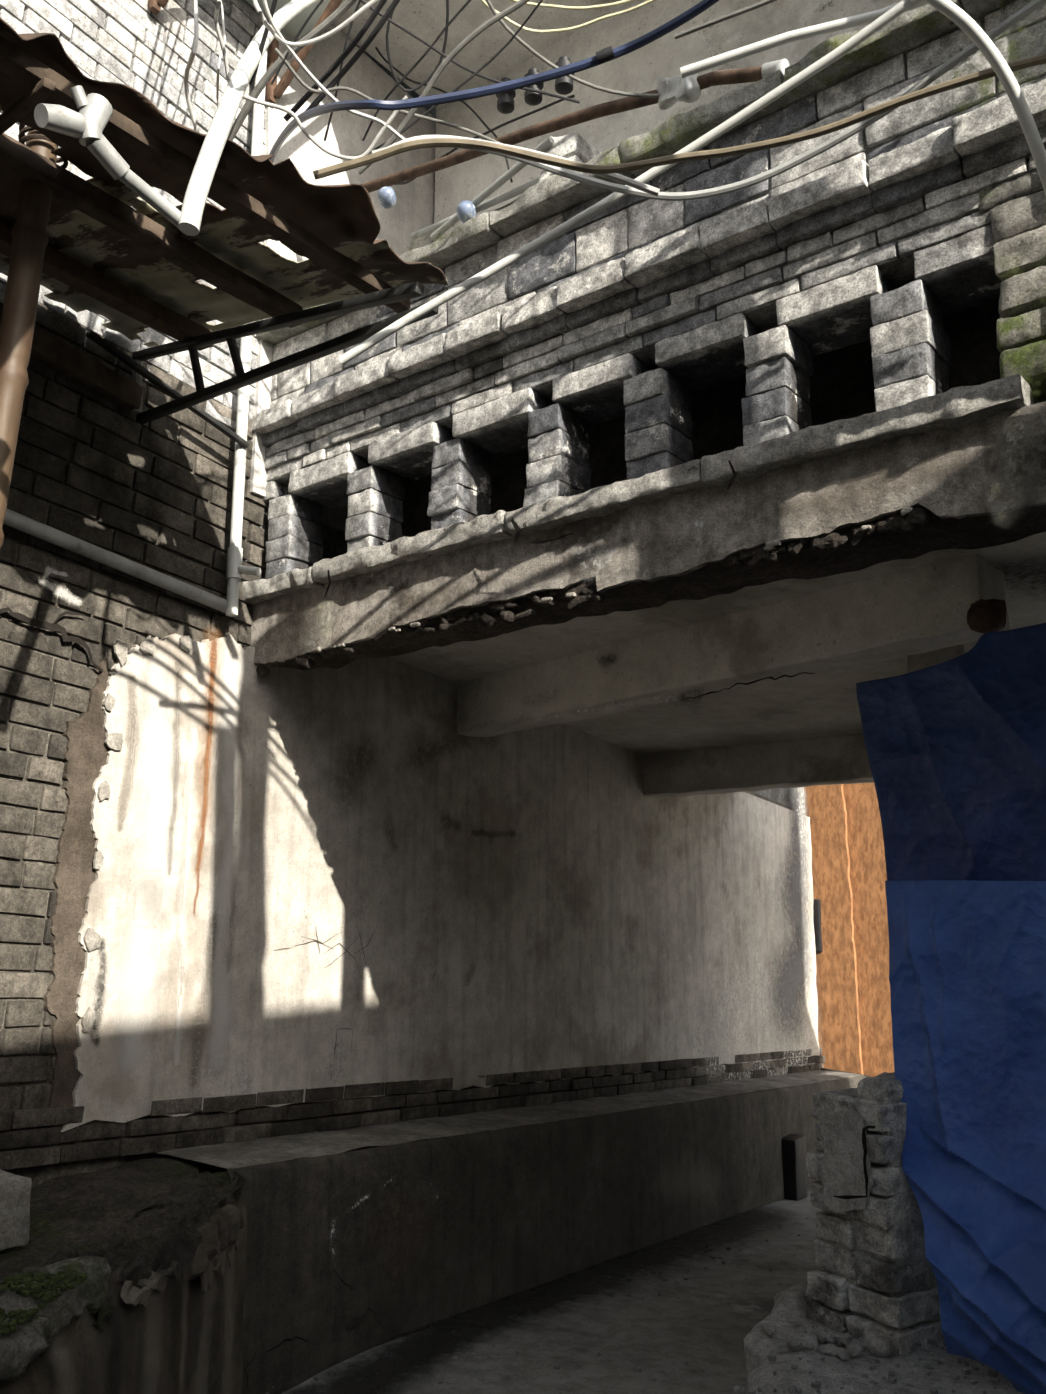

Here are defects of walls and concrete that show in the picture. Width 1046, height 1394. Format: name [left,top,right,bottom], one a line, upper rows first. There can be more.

spalling [721,506,931,568]
spalling [387,580,610,638]
flaking render [113,635,155,667]
flaking render [179,636,194,653]
crack [680,672,814,701]
flaking render [103,693,116,711]
flaking render [105,733,124,750]
flaking render [97,781,111,801]
corrosion [194,640,217,913]
flaking render [93,851,104,869]
spalling [120,1204,244,1307]